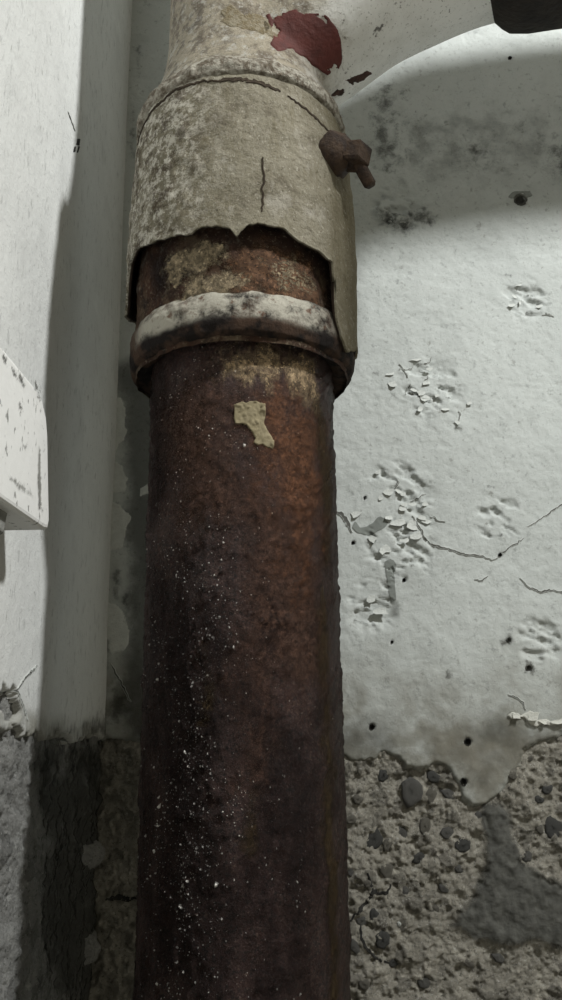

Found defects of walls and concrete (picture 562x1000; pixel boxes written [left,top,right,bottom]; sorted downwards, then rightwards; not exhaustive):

peeling [386,357,473,429]
peeling [351,479,445,614]
crack [412,504,562,582]
crack [519,578,562,593]
water stain [40,745,103,1000]
spalling [344,711,562,1000]